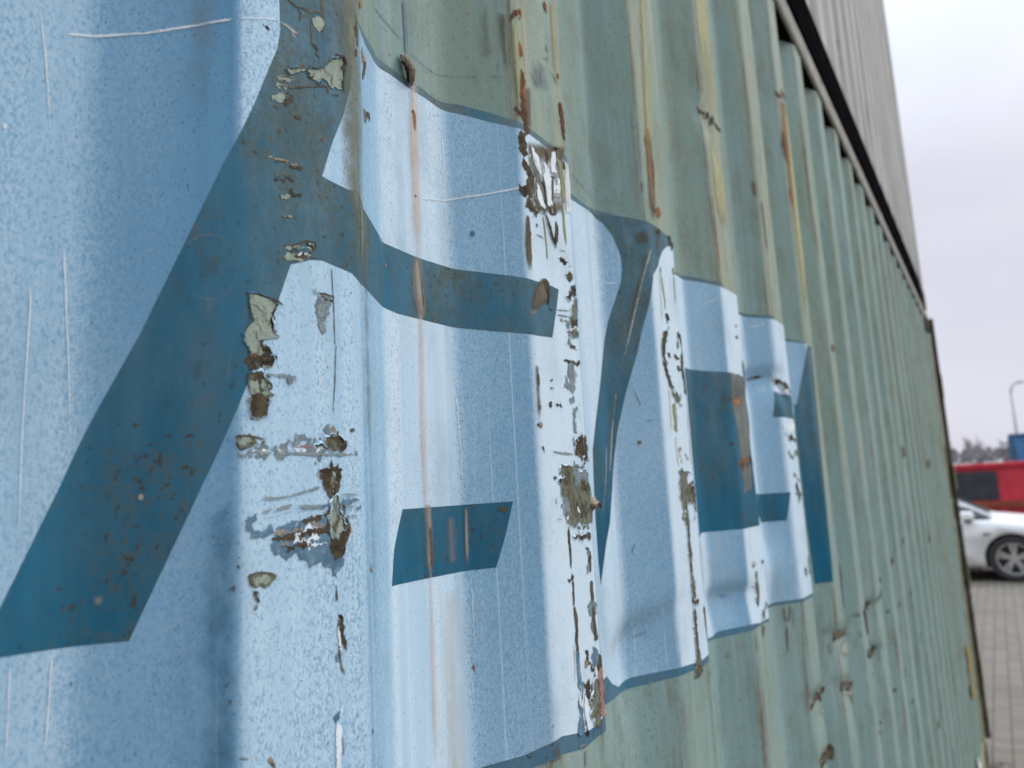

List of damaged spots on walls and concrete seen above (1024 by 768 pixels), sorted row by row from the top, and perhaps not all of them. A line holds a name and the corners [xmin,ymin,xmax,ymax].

peeling [271,12,367,120]
corrosion [510,8,531,135]
corrosion [640,0,661,218]
peeling [241,291,296,420]
corrosion [415,260,424,355]
peeling [518,130,593,543]
peeling [661,313,697,517]
peeling [235,423,361,578]